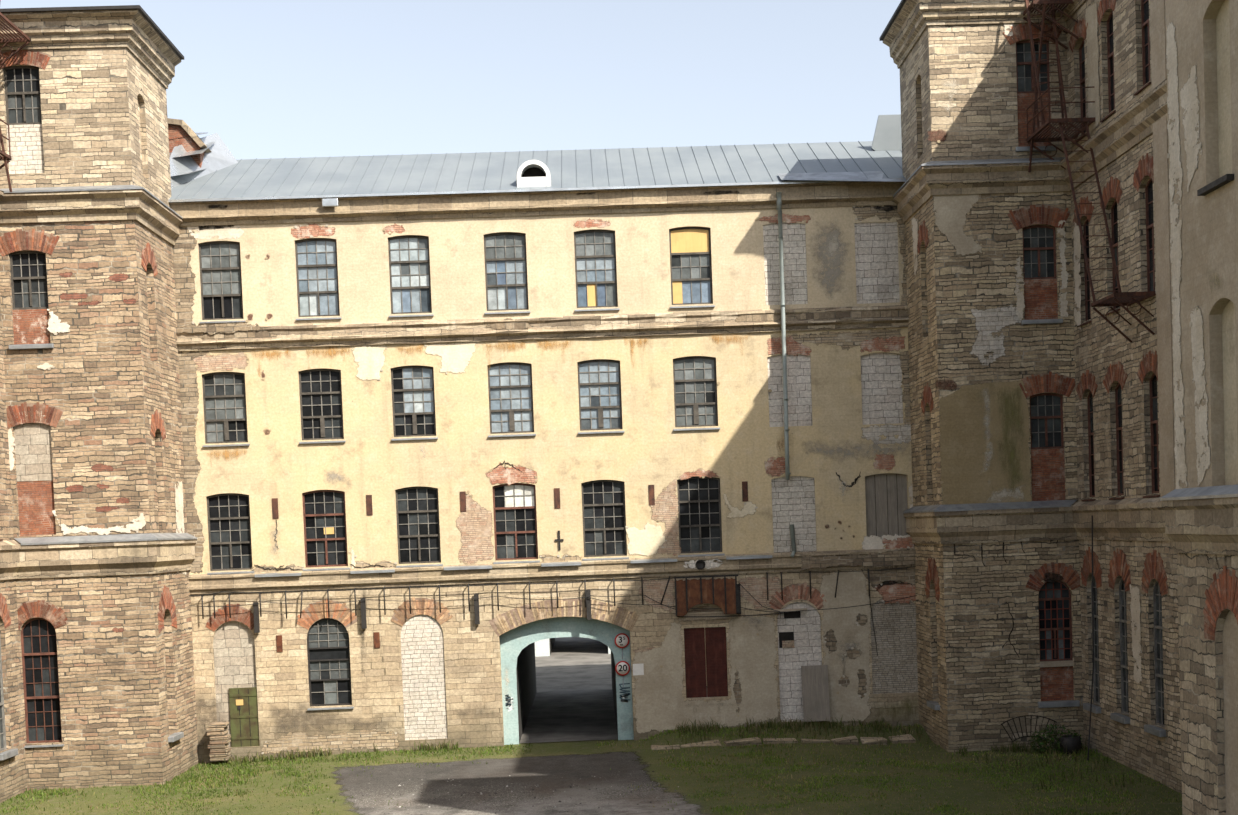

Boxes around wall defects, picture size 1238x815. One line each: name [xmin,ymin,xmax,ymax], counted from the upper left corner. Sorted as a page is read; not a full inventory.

flaking render [60,293,100,306]
peeling [47,309,70,335]
peeling [351,344,387,380]
peeling [425,342,477,374]
crack [836,472,861,487]
spalling [456,491,494,565]
spalling [626,468,723,569]
peeling [801,521,916,723]
peeling [631,575,807,733]